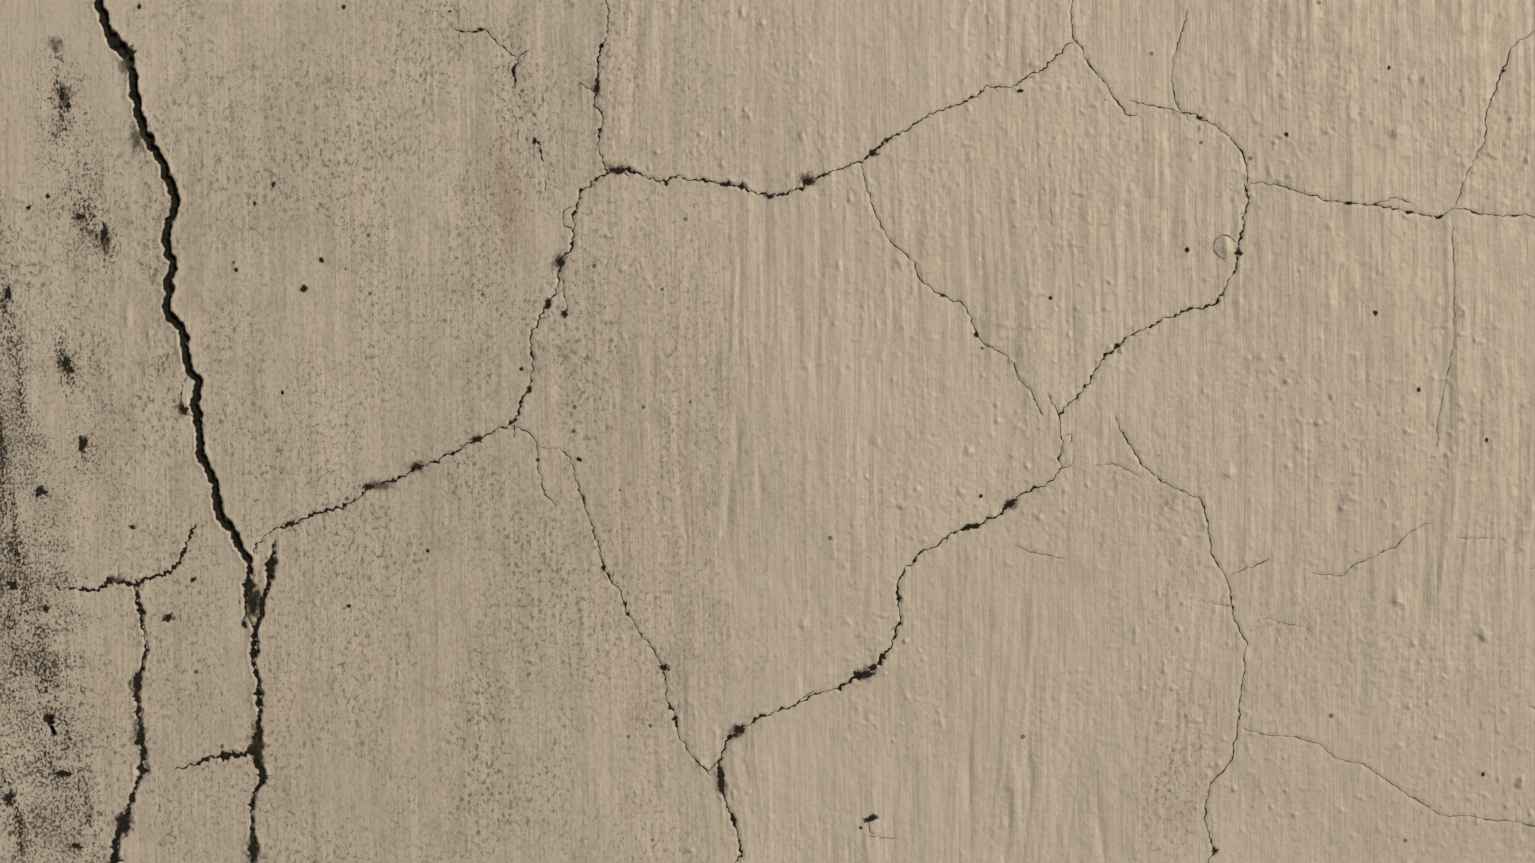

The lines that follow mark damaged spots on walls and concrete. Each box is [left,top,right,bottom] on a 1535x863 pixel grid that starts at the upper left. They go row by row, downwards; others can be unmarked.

crack [55,524,196,863]
crack [94,0,1135,863]
crack [543,65,1535,863]
crack [1466,30,1535,179]